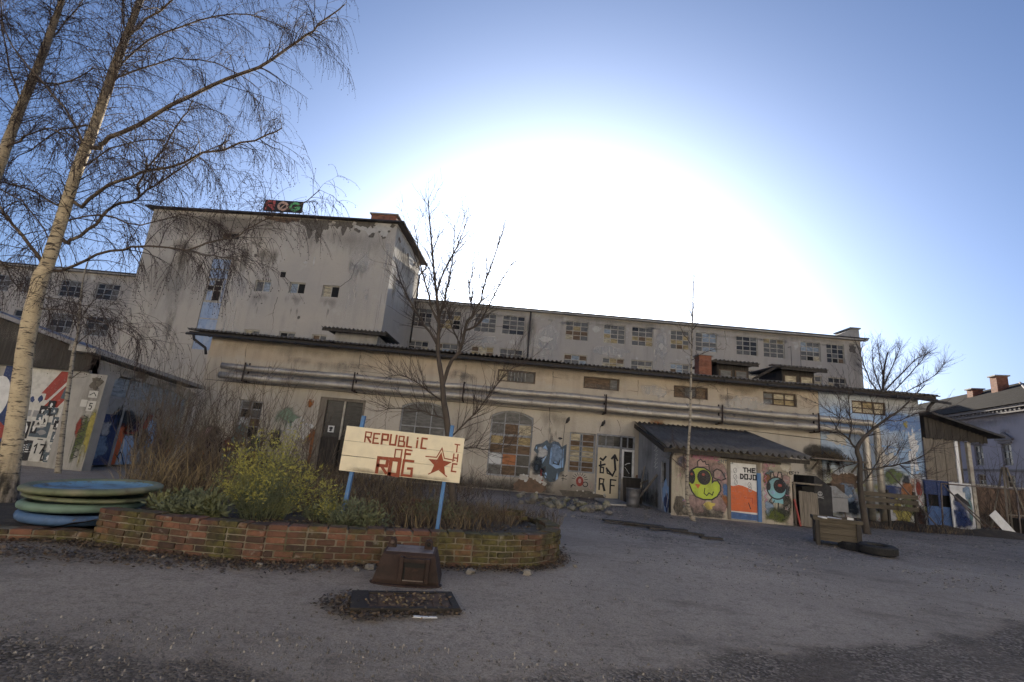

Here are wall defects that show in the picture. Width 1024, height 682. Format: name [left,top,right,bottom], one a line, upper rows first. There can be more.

spalling [264,216,420,268]